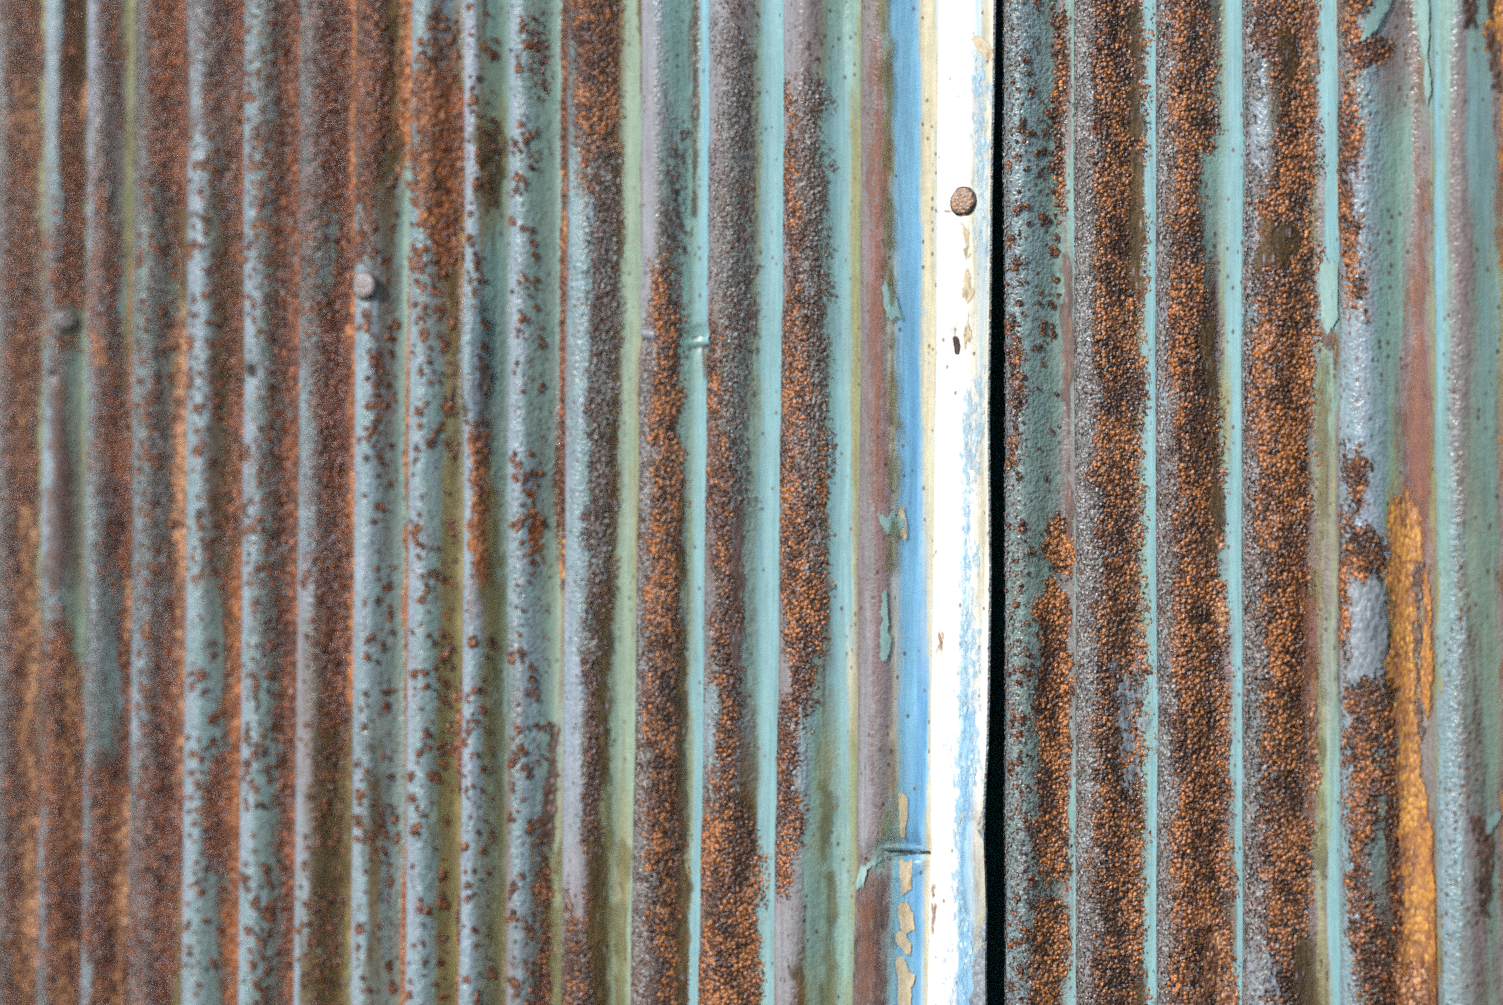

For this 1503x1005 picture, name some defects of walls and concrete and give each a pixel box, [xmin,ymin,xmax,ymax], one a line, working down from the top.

rust [0,0,839,1005]
peeling [898,791,908,839]
peeling [895,859,915,1005]
rust [1002,0,1410,1005]